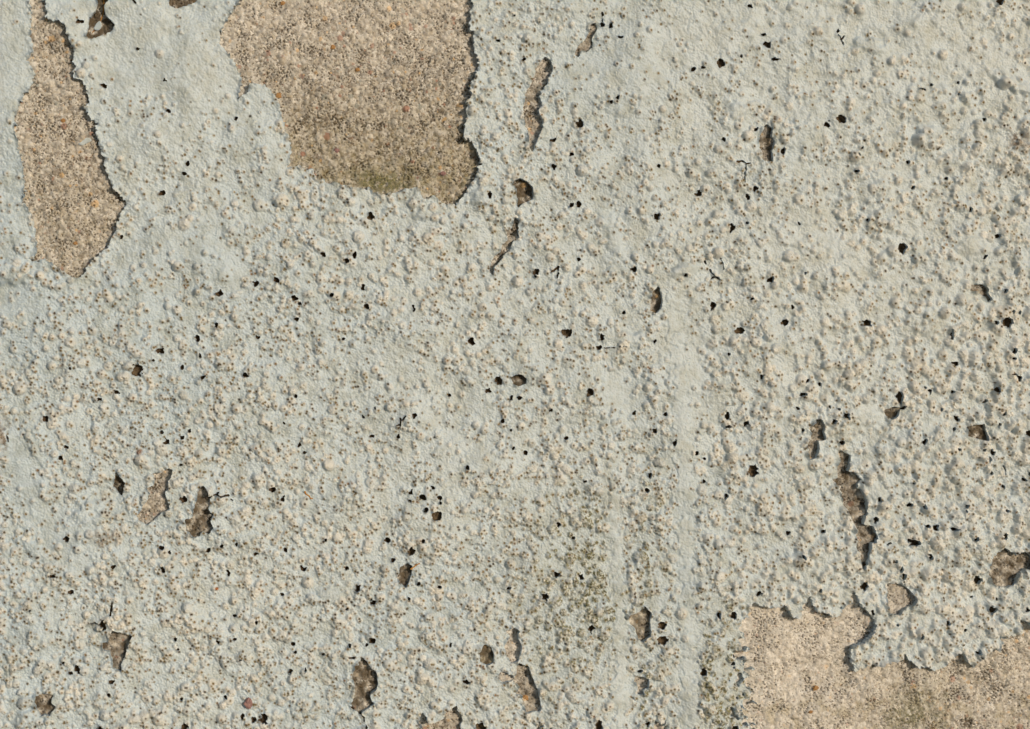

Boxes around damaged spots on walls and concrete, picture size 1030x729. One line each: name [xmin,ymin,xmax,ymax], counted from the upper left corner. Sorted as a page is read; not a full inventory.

peeling [13,0,126,278]
peeling [219,0,482,206]
peeling [523,57,553,152]
peeling [136,469,213,538]
peeling [629,607,669,647]
peeling [717,450,1030,729]
peeling [351,657,378,714]
peeling [417,706,463,729]
peeling [480,628,552,729]